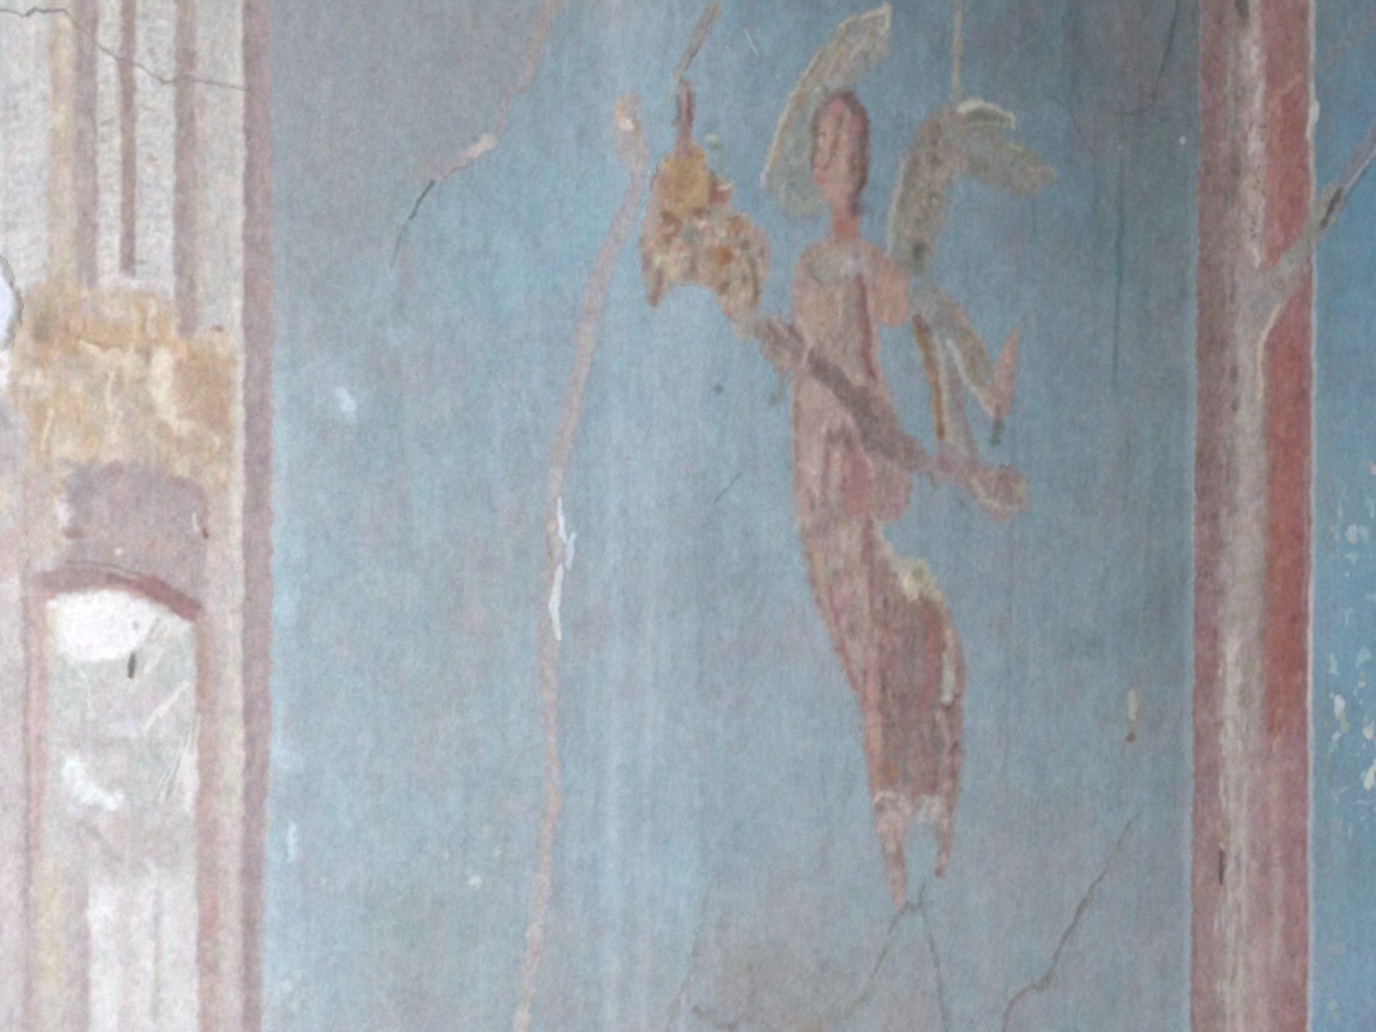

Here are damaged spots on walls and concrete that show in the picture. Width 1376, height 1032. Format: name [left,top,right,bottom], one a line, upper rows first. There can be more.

crack [0,1,270,101]
peeling [1328,690,1376,742]
peeling [1359,758,1376,812]
crack [657,869,788,1032]
crack [860,807,1144,1032]